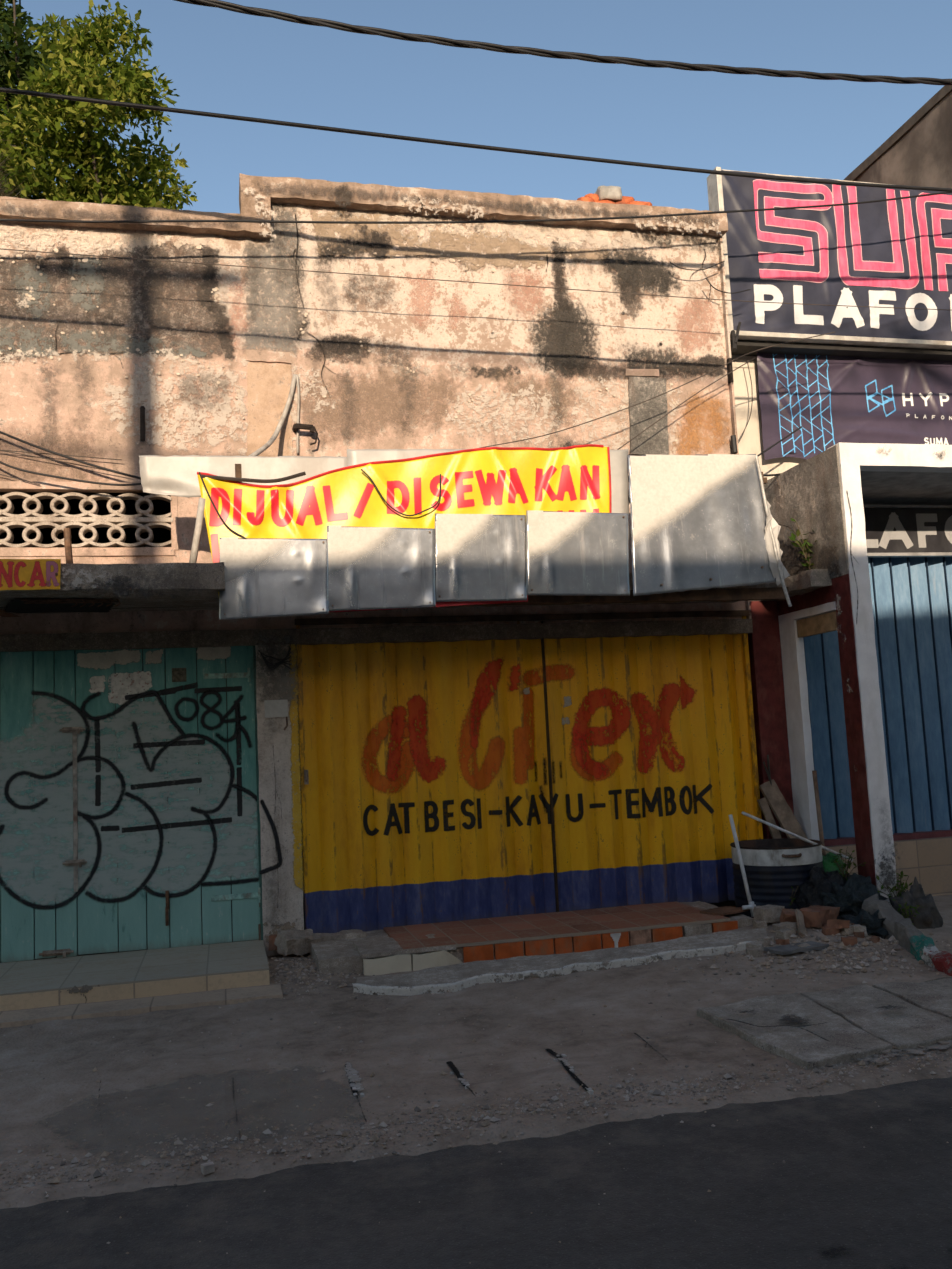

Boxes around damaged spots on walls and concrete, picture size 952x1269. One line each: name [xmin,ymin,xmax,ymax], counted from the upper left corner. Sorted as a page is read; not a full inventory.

peeling [244,187,276,240]
leakage [0,181,726,440]
flaking render [311,197,722,329]